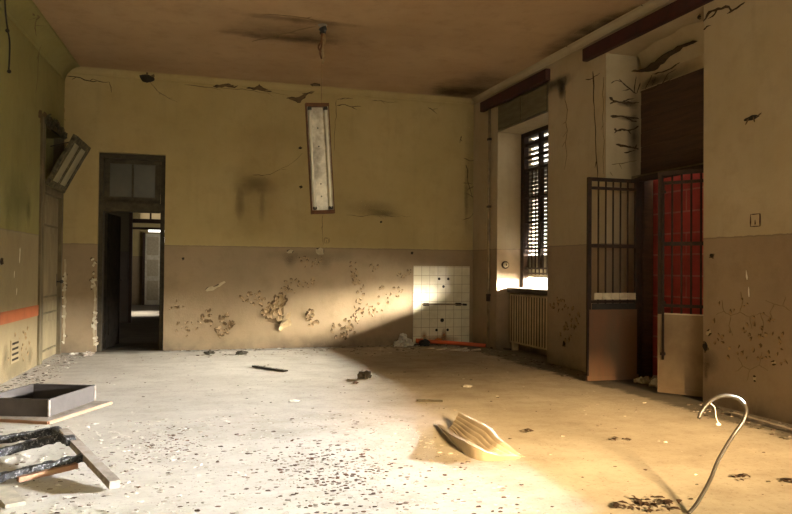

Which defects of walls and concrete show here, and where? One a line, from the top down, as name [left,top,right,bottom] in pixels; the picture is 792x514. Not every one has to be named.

crack [703,2,745,30]
flaking render [213,83,272,92]
flaking render [286,83,320,103]
crack [586,70,674,177]
peeling [89,257,100,346]
peeling [239,277,315,331]
peeling [305,308,319,328]
peeling [330,261,411,340]